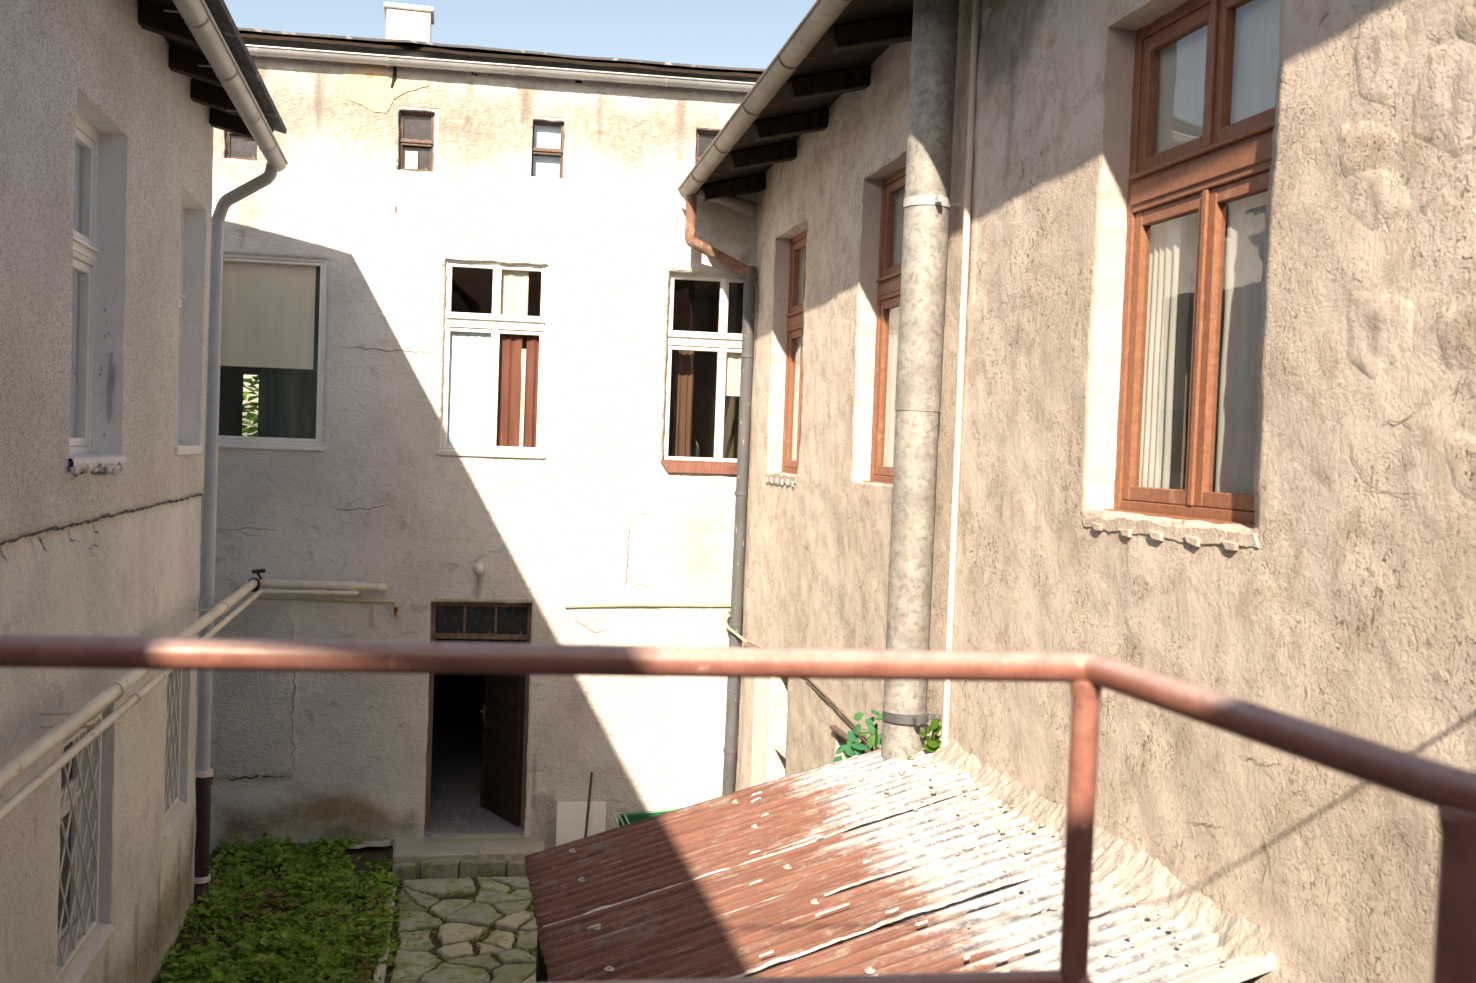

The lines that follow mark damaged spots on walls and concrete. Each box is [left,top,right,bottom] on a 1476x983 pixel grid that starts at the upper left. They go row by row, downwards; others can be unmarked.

flaking render [341,64,429,113]
crack [0,493,203,560]
crack [625,513,659,596]
damp [79,773,431,983]